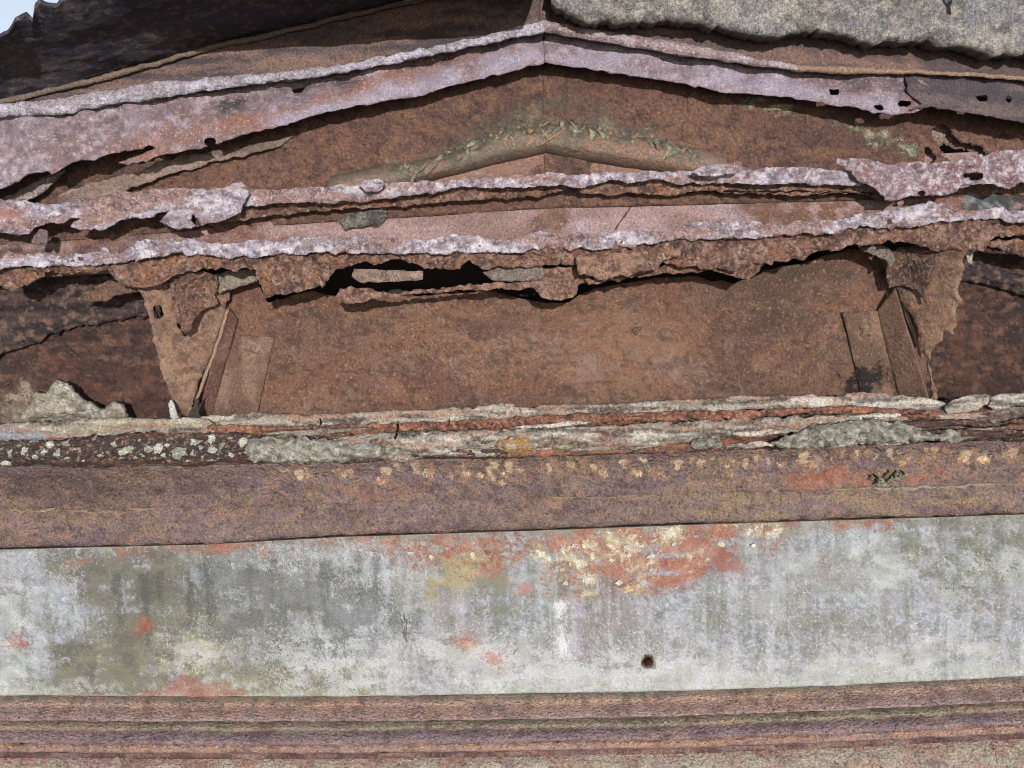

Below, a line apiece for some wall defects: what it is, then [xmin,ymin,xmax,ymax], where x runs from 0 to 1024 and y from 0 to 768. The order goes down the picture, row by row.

rust [529,208,570,234]
peeling [77,280,139,302]
peeling [169,269,258,335]
peeling [884,247,935,303]
rust [524,295,706,400]
rust [0,359,1024,469]
damp [883,516,1024,613]
damp [17,534,556,697]
damp [549,596,572,664]